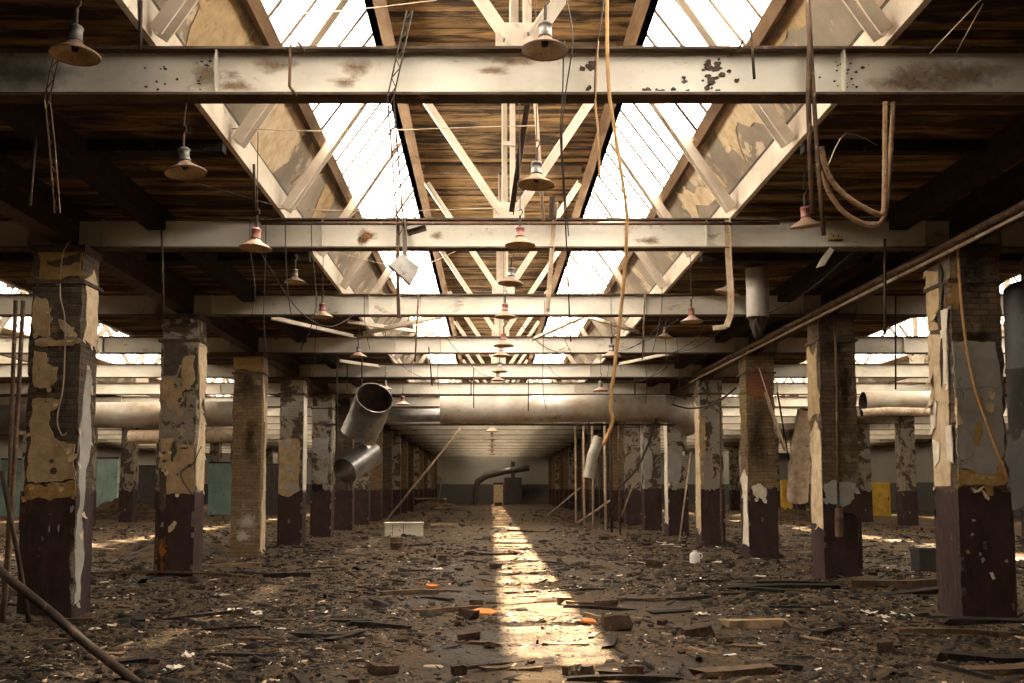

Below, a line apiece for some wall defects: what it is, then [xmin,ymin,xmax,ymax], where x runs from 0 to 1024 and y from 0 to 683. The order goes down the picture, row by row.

peeling [186,0,260,90]
rust [339,64,366,86]
peeling [701,58,740,91]
peeling [716,104,763,161]
peeling [676,185,715,218]
peeling [21,243,102,608]
peeling [159,338,208,497]
peeling [233,356,329,553]
peeling [806,342,860,530]
peeling [922,261,1007,500]
peeling [740,469,767,546]